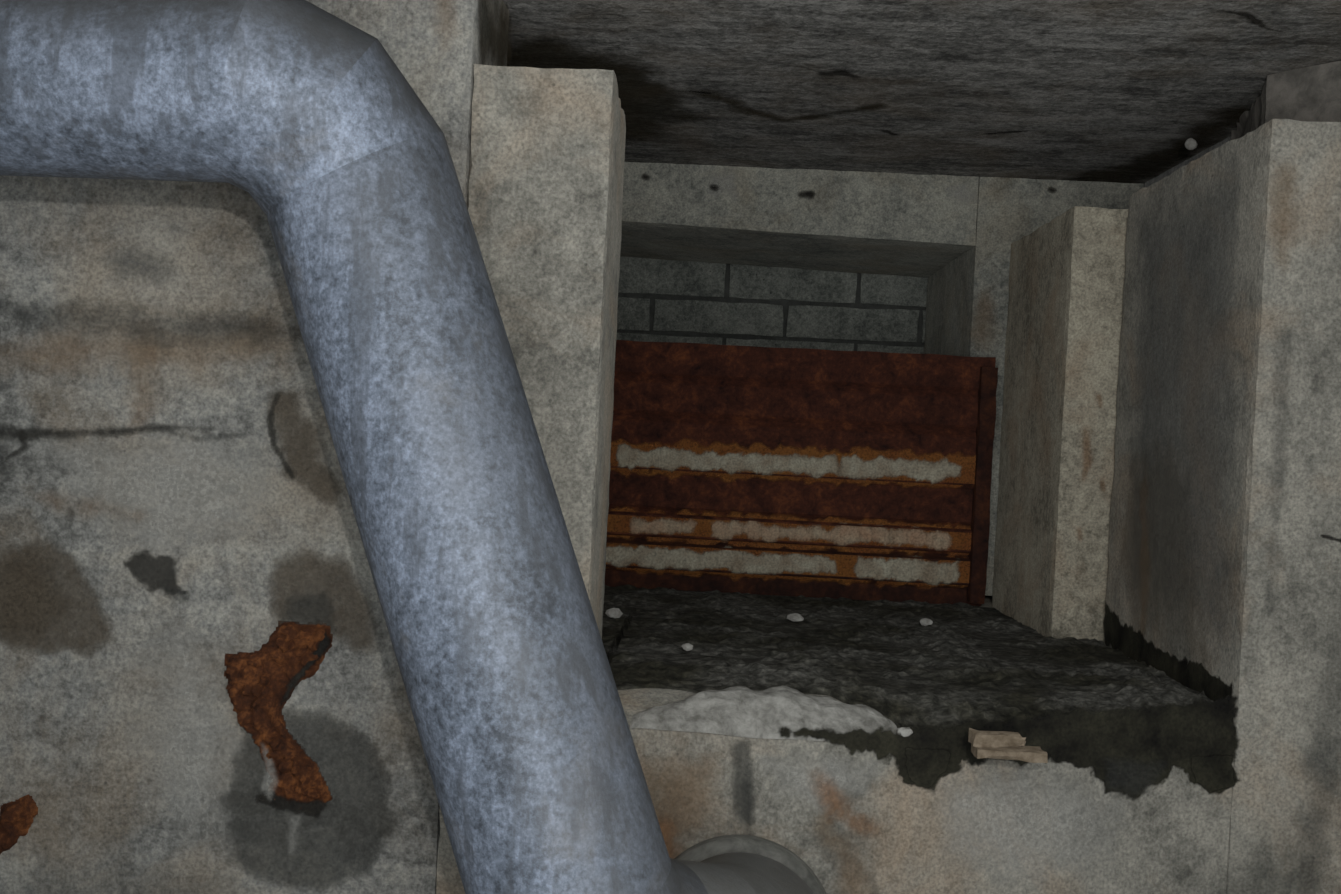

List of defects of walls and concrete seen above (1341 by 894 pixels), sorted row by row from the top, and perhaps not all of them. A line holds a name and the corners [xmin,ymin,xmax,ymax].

crack [0,426,170,457]
corrosion [610,439,976,488]
leakage [0,545,107,651]
leakage [125,551,185,594]
corrosion [606,507,972,588]
leakage [230,717,389,884]